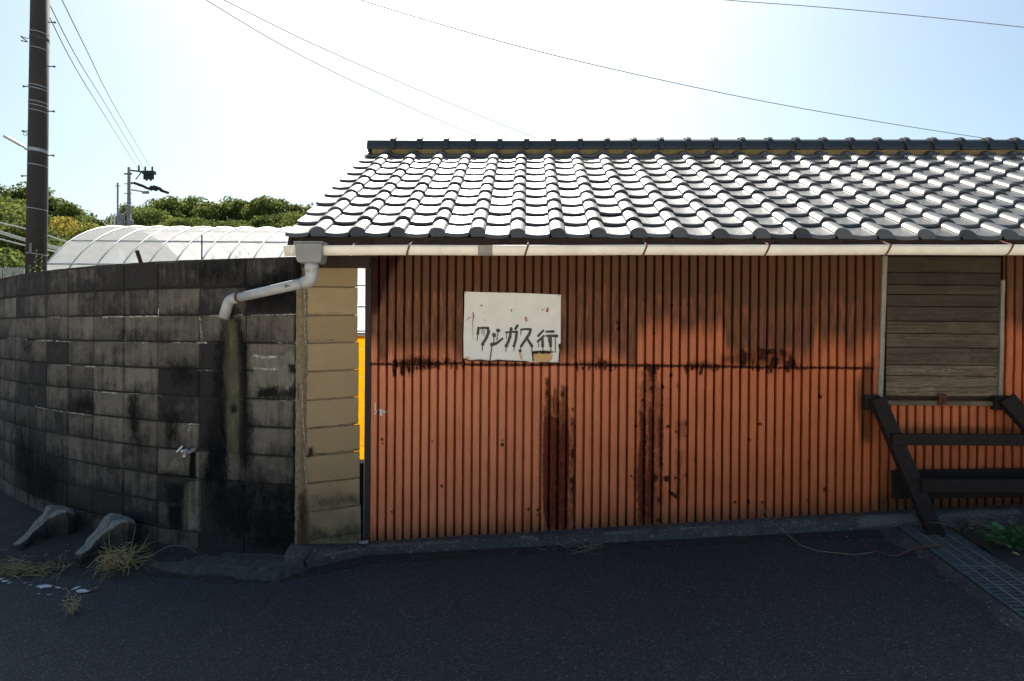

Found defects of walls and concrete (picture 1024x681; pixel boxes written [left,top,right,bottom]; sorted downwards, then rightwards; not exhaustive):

leakage [128,393,139,442]
leakage [156,270,300,553]
rust [371,348,874,531]